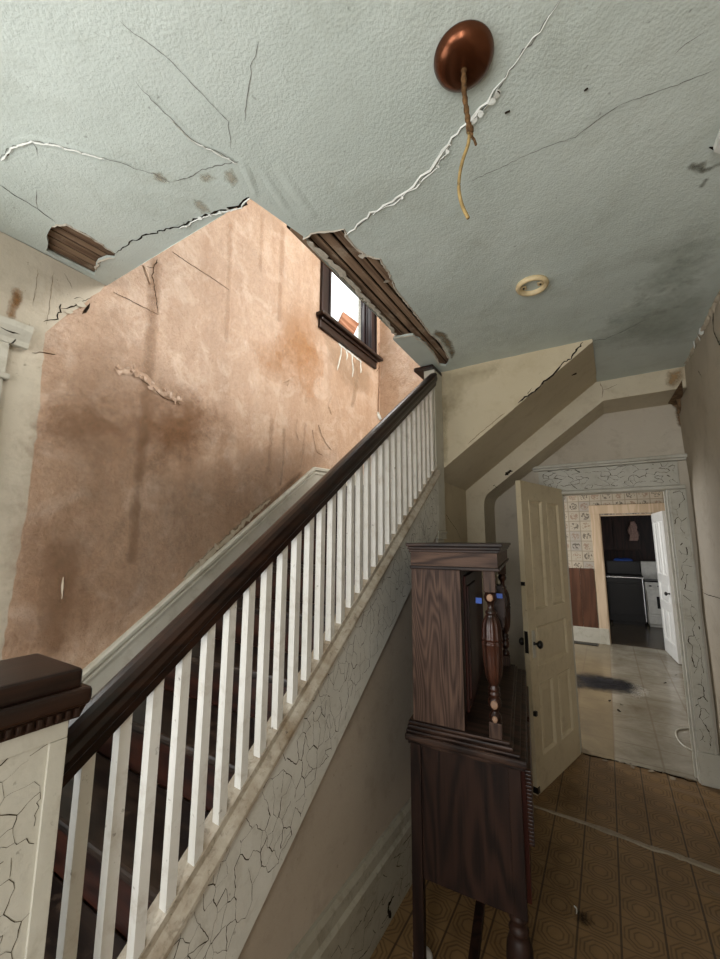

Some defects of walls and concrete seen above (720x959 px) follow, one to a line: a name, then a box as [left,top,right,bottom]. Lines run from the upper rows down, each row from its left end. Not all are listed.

crack [0,24,259,183]
crack [347,1,559,234]
crack [473,71,711,181]
spalling [52,223,114,270]
crack [115,197,250,254]
spalling [303,229,449,365]
crack [468,325,635,444]
water stain [230,474,300,540]
crack [543,463,718,747]
crack [174,489,460,959]
crack [0,744,47,959]